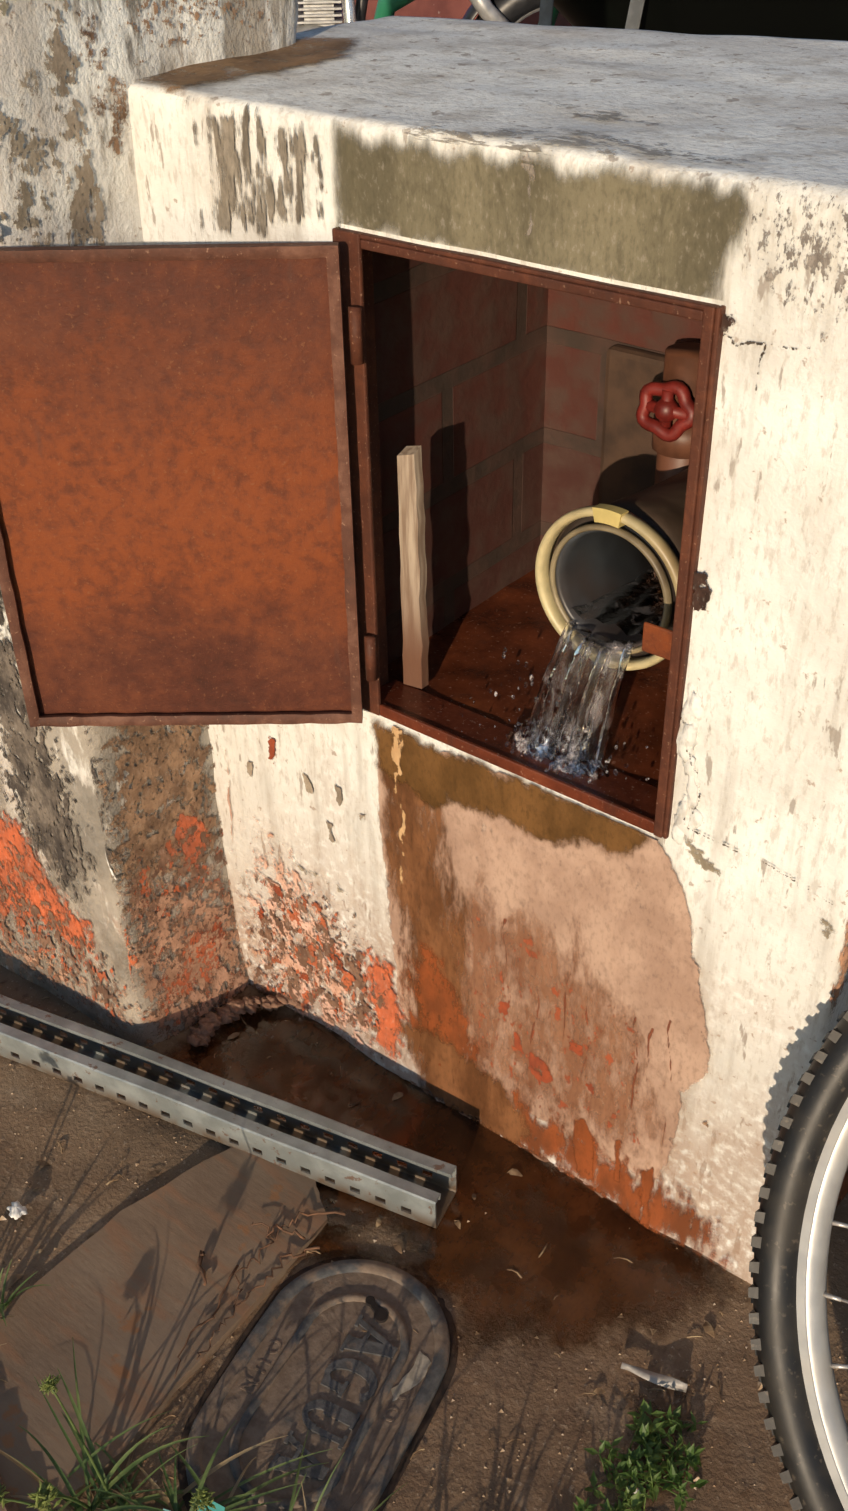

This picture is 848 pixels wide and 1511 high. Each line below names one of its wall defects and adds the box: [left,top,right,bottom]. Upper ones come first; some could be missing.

peeling [0,0,129,247]
leakage [192,101,848,342]
peeling [0,586,223,965]
rust [0,750,729,1266]